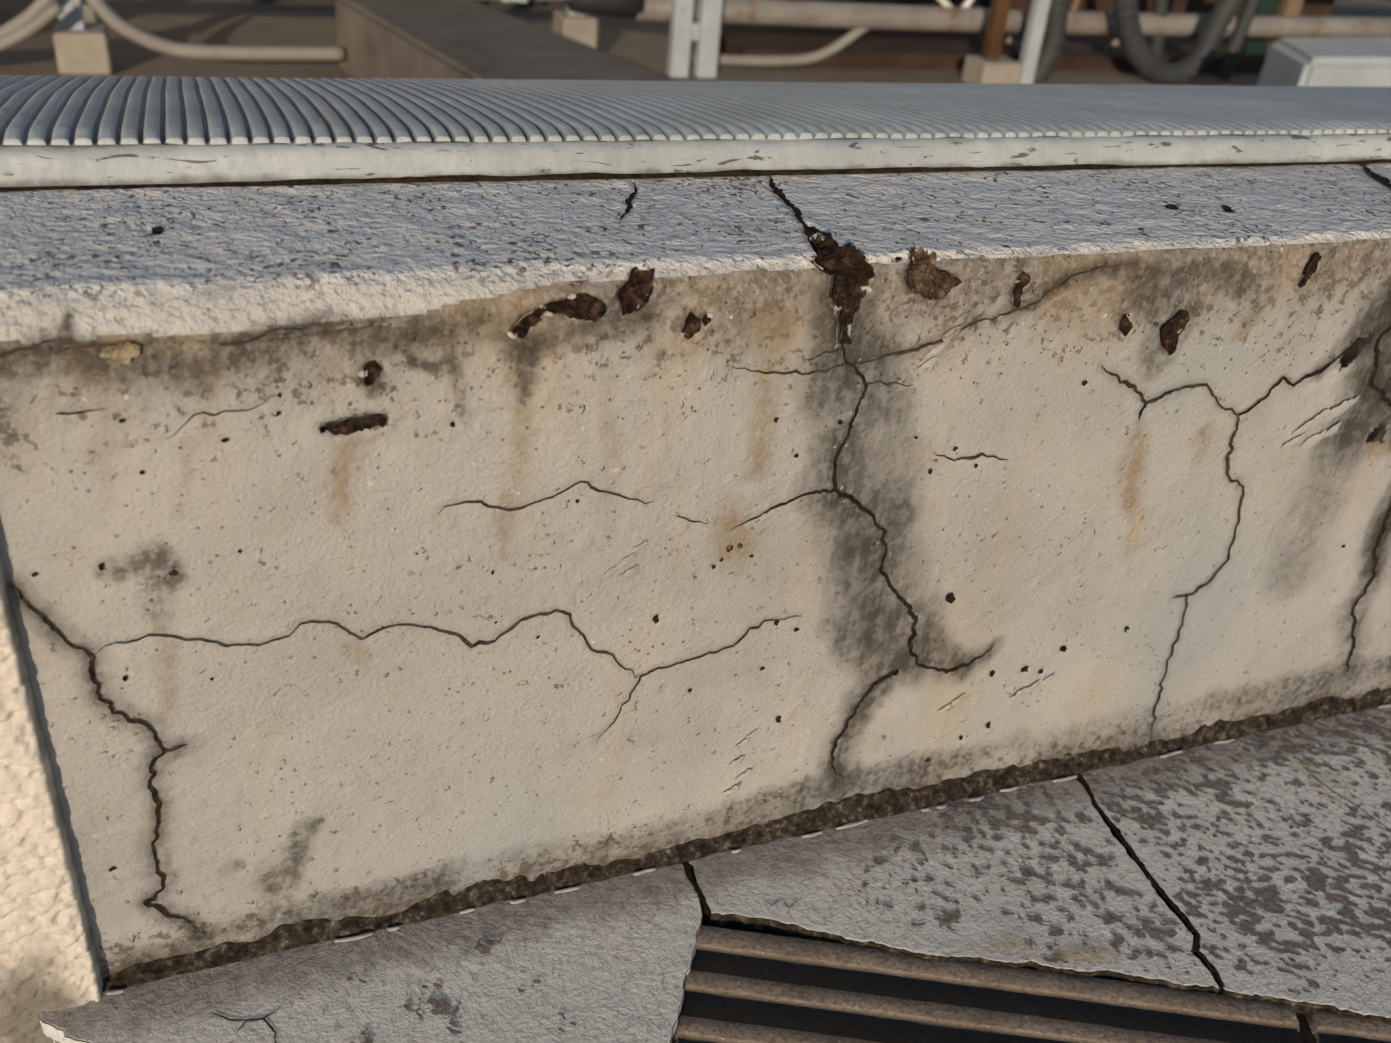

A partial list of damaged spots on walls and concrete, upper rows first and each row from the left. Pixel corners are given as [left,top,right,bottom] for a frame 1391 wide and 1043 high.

crack [619,182,638,220]
crack [769,176,838,257]
spalling [805,232,875,345]
spalling [907,242,962,300]
crack [1360,164,1391,187]
crack [166,395,277,440]
water stain [1335,293,1391,450]
crack [437,264,1129,779]
water stain [813,278,991,795]
crack [1101,325,1391,739]
crack [9,583,802,936]
crack [1077,774,1225,987]